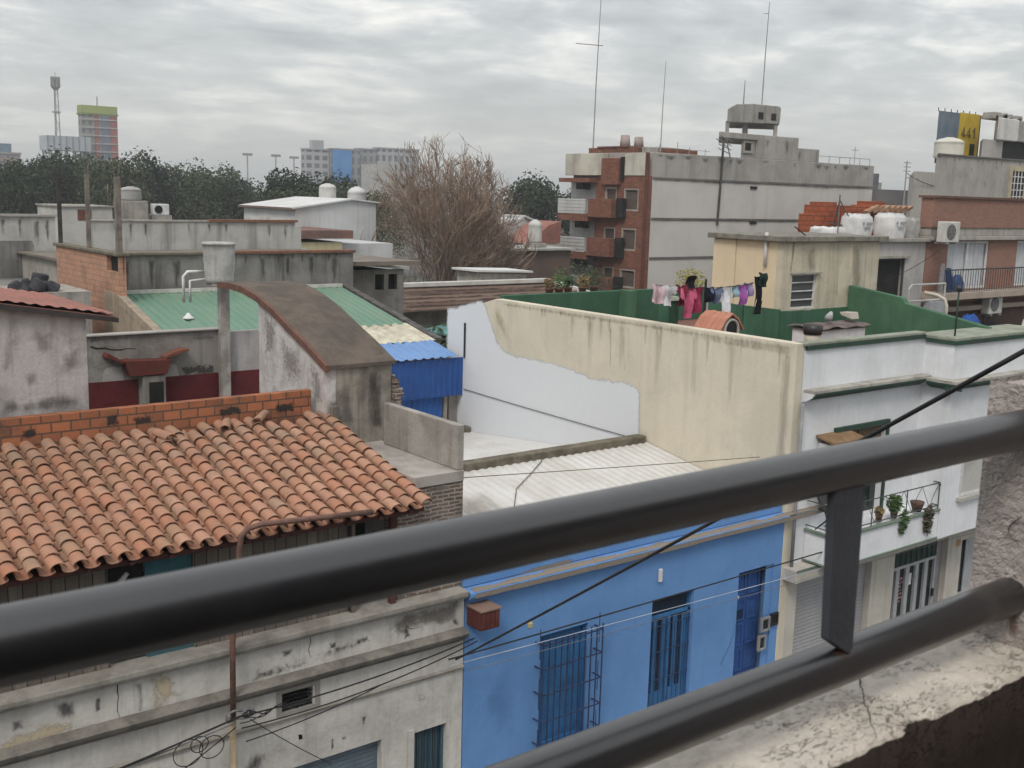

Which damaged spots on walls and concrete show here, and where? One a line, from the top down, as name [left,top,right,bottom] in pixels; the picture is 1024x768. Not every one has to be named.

water stain [396,602,457,636]
crack [859,679,880,768]